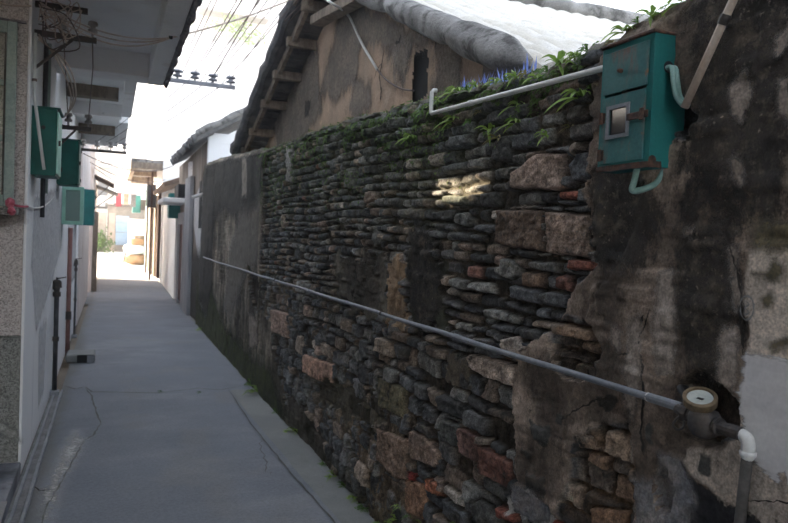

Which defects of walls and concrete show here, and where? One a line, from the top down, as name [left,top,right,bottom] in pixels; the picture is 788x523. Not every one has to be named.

damp [581,0,788,400]
crack [35,386,101,523]
crack [129,385,335,523]
spalling [547,267,788,523]
damp [633,454,735,523]
crack [752,498,788,506]